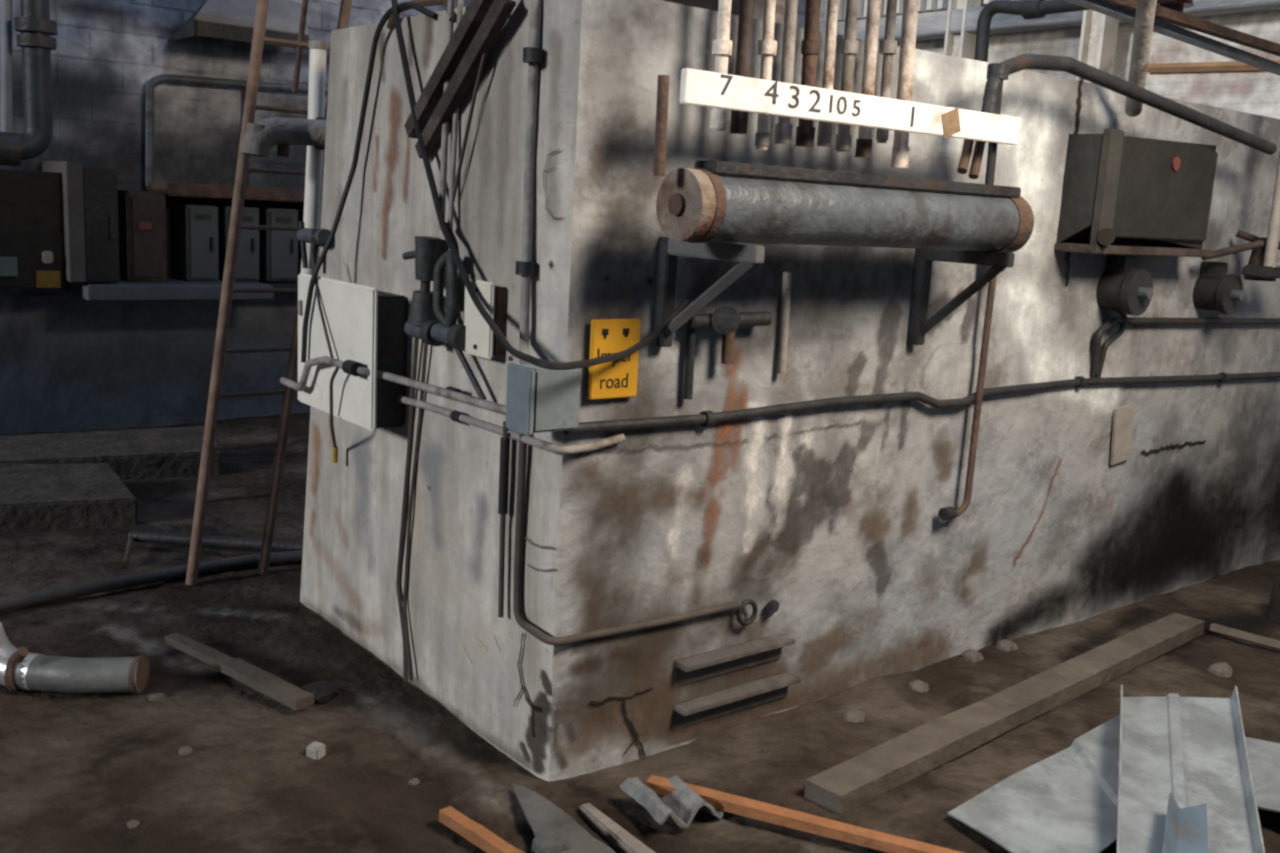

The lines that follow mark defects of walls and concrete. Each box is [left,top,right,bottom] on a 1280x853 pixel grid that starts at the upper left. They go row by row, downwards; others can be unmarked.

rust [374,94,408,258]
water stain [668,472,689,558]
water stain [741,403,811,594]
water stain [861,495,916,539]
water stain [1111,543,1212,597]
water stain [802,626,847,670]